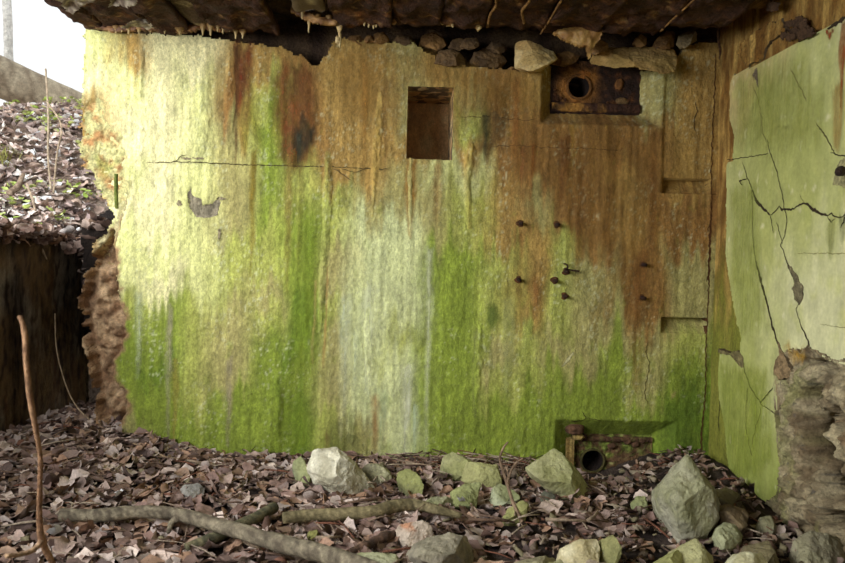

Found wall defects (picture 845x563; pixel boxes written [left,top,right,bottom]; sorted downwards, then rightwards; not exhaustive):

corrosion [276,63,315,167]
corrosion [615,78,628,104]
peeling [736,1,816,67]
corrosion [826,23,845,143]
crack [827,16,845,30]
spalling [77,98,132,425]
peeling [176,188,226,218]
crack [147,155,389,180]
crack [694,53,845,455]
spalling [765,342,845,555]